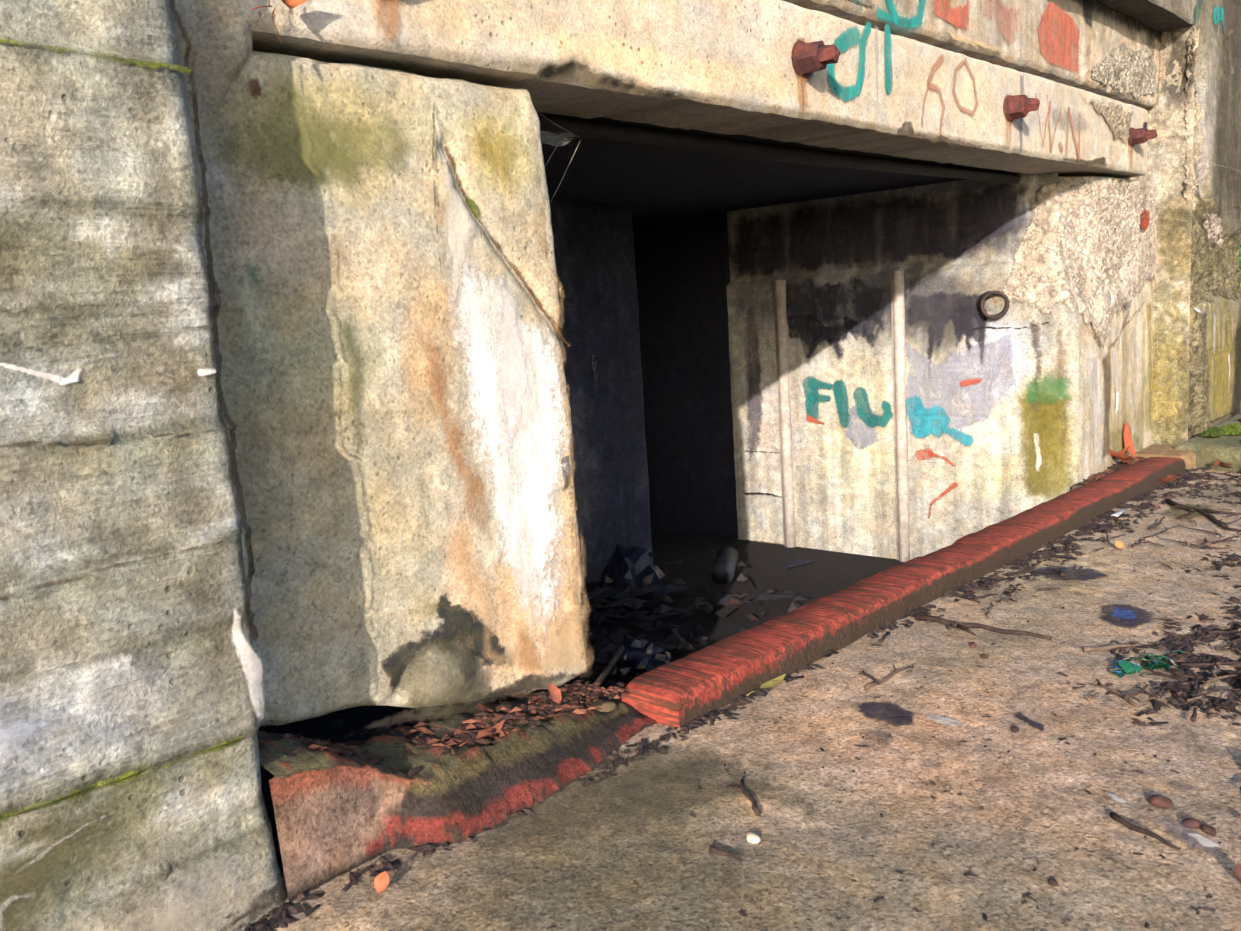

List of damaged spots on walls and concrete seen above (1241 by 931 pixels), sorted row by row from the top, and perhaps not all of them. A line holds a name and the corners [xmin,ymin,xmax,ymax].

rust [793,38,813,110]
spalling [897,121,982,148]
spalling [1085,42,1157,143]
crack [432,104,570,347]
spalling [998,157,1158,358]
damp [799,317,875,359]
peeling [845,406,876,450]
peeling [905,292,1012,428]
damp [962,307,987,361]
damp [1033,433,1042,471]
damp [1081,348,1119,456]
damp [381,594,511,692]